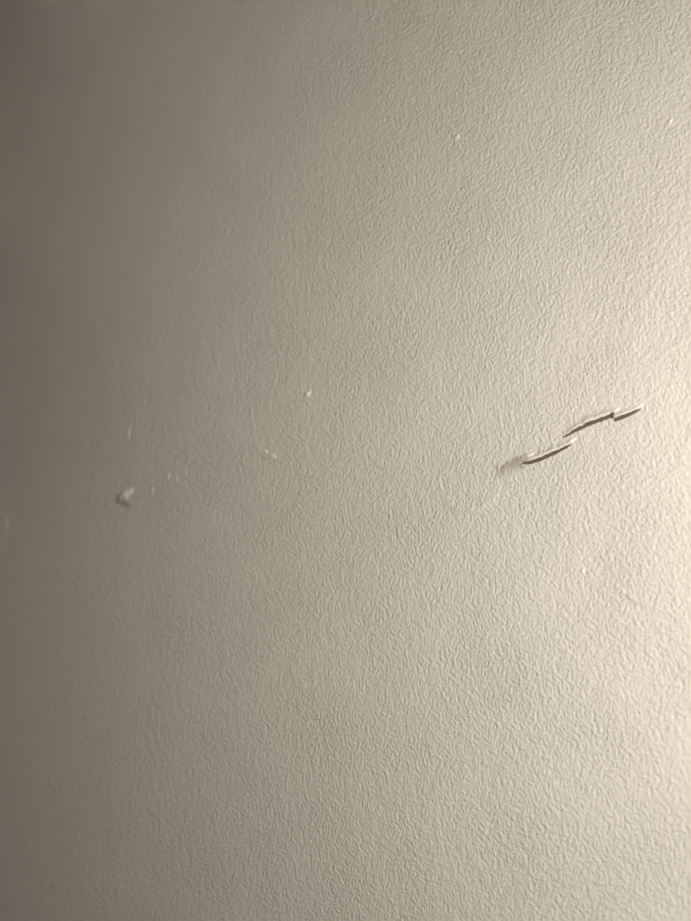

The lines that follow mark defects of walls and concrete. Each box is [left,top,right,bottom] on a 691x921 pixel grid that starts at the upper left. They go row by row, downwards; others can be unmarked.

crack [498,402,645,473]